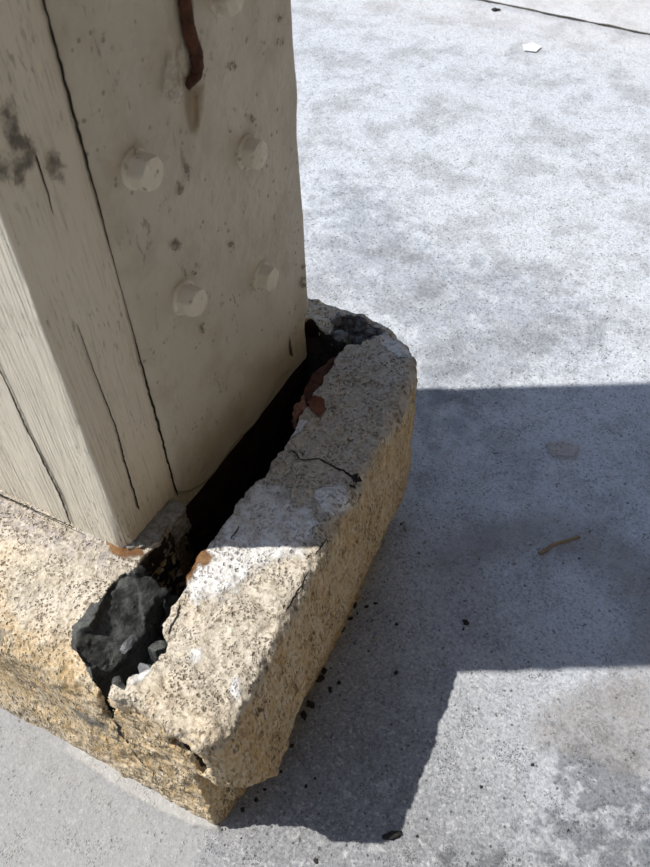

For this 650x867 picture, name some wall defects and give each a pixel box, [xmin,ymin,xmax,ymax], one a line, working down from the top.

crack [35,153,54,215]
crack [77,324,139,509]
corrosion [292,395,325,431]
crack [0,370,74,528]
crack [290,450,362,503]
spalling [71,557,179,712]
spalling [177,739,207,768]